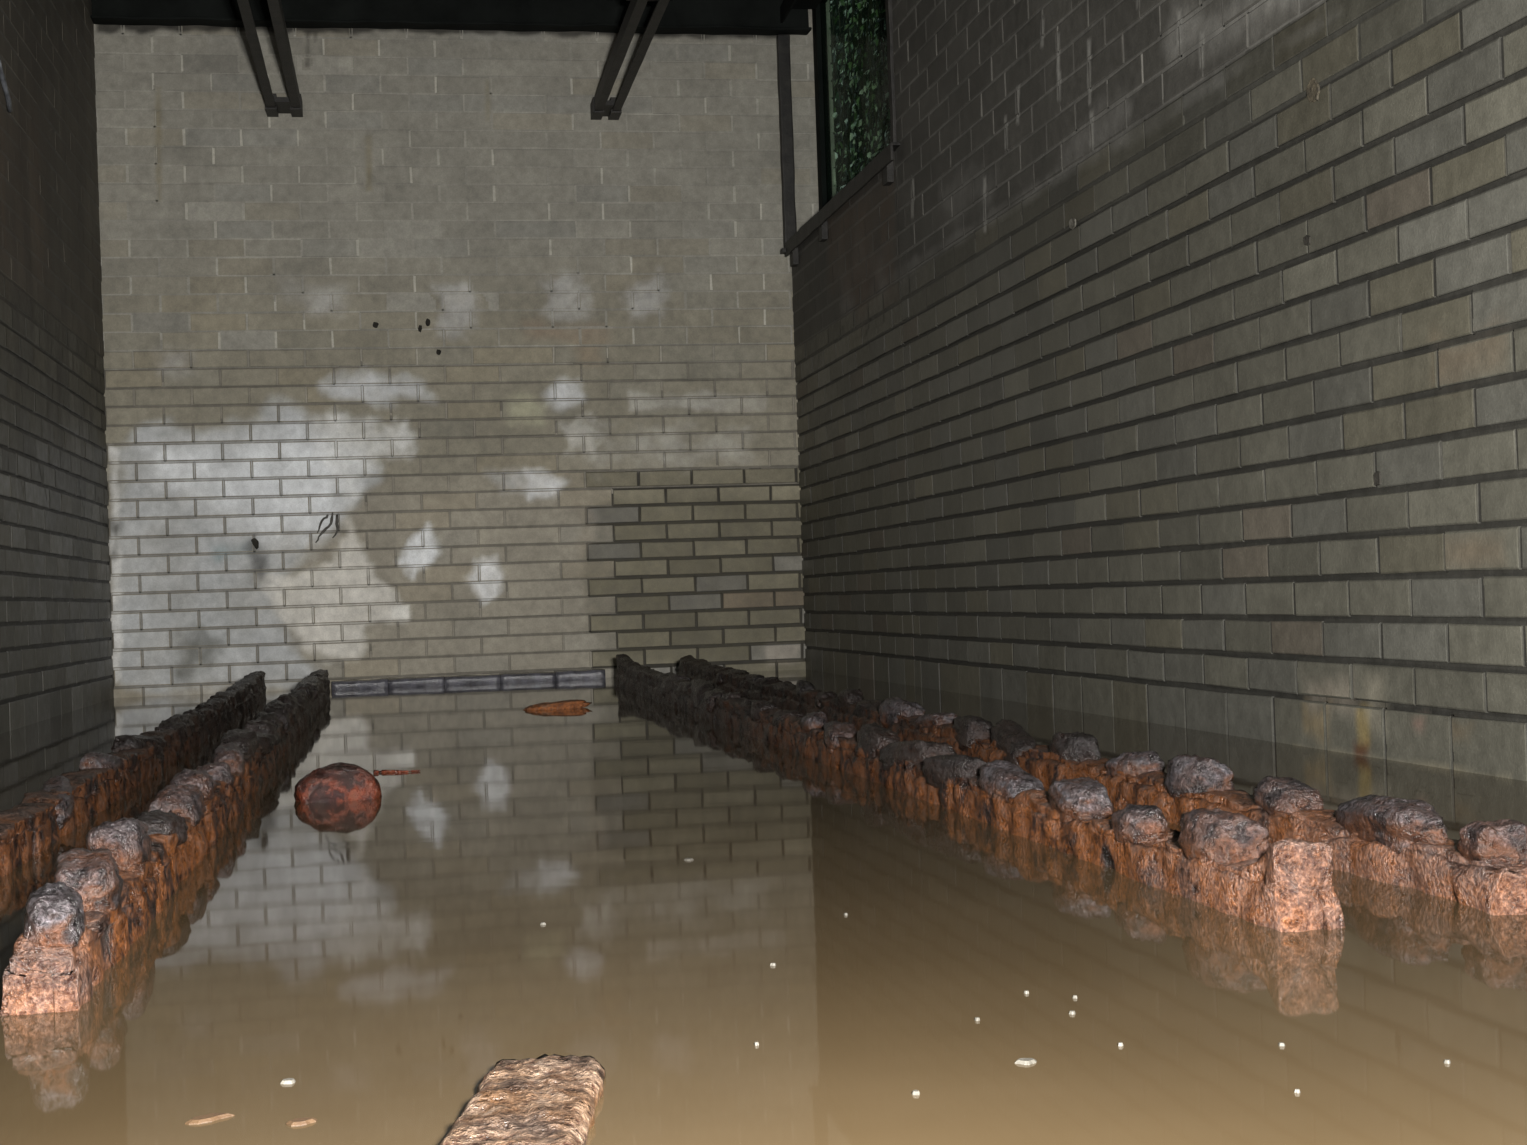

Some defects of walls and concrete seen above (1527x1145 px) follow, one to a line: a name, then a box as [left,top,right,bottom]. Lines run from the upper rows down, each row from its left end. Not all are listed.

leakage [0,0,806,692]